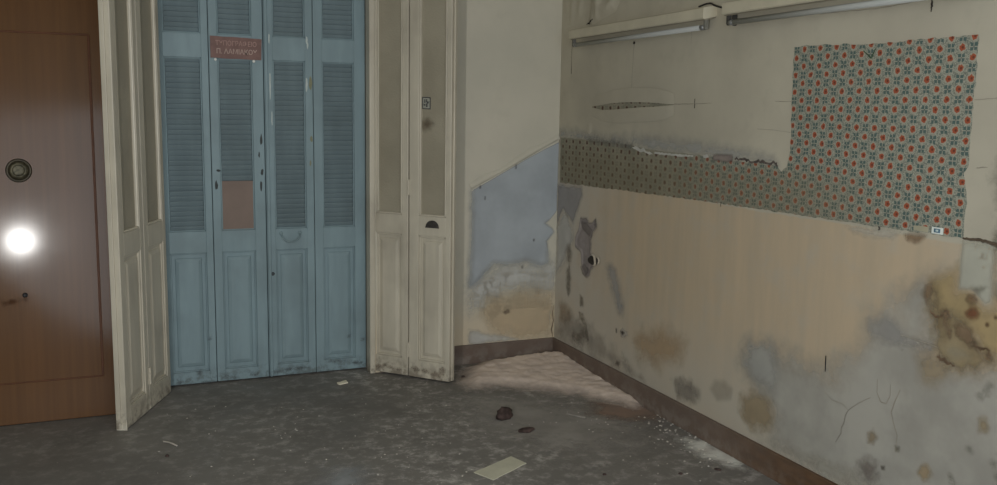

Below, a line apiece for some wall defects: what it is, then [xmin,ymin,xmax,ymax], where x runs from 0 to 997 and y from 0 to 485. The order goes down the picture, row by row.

peeling [469,134,600,285]
damp [469,292,588,344]
damp [925,276,997,372]